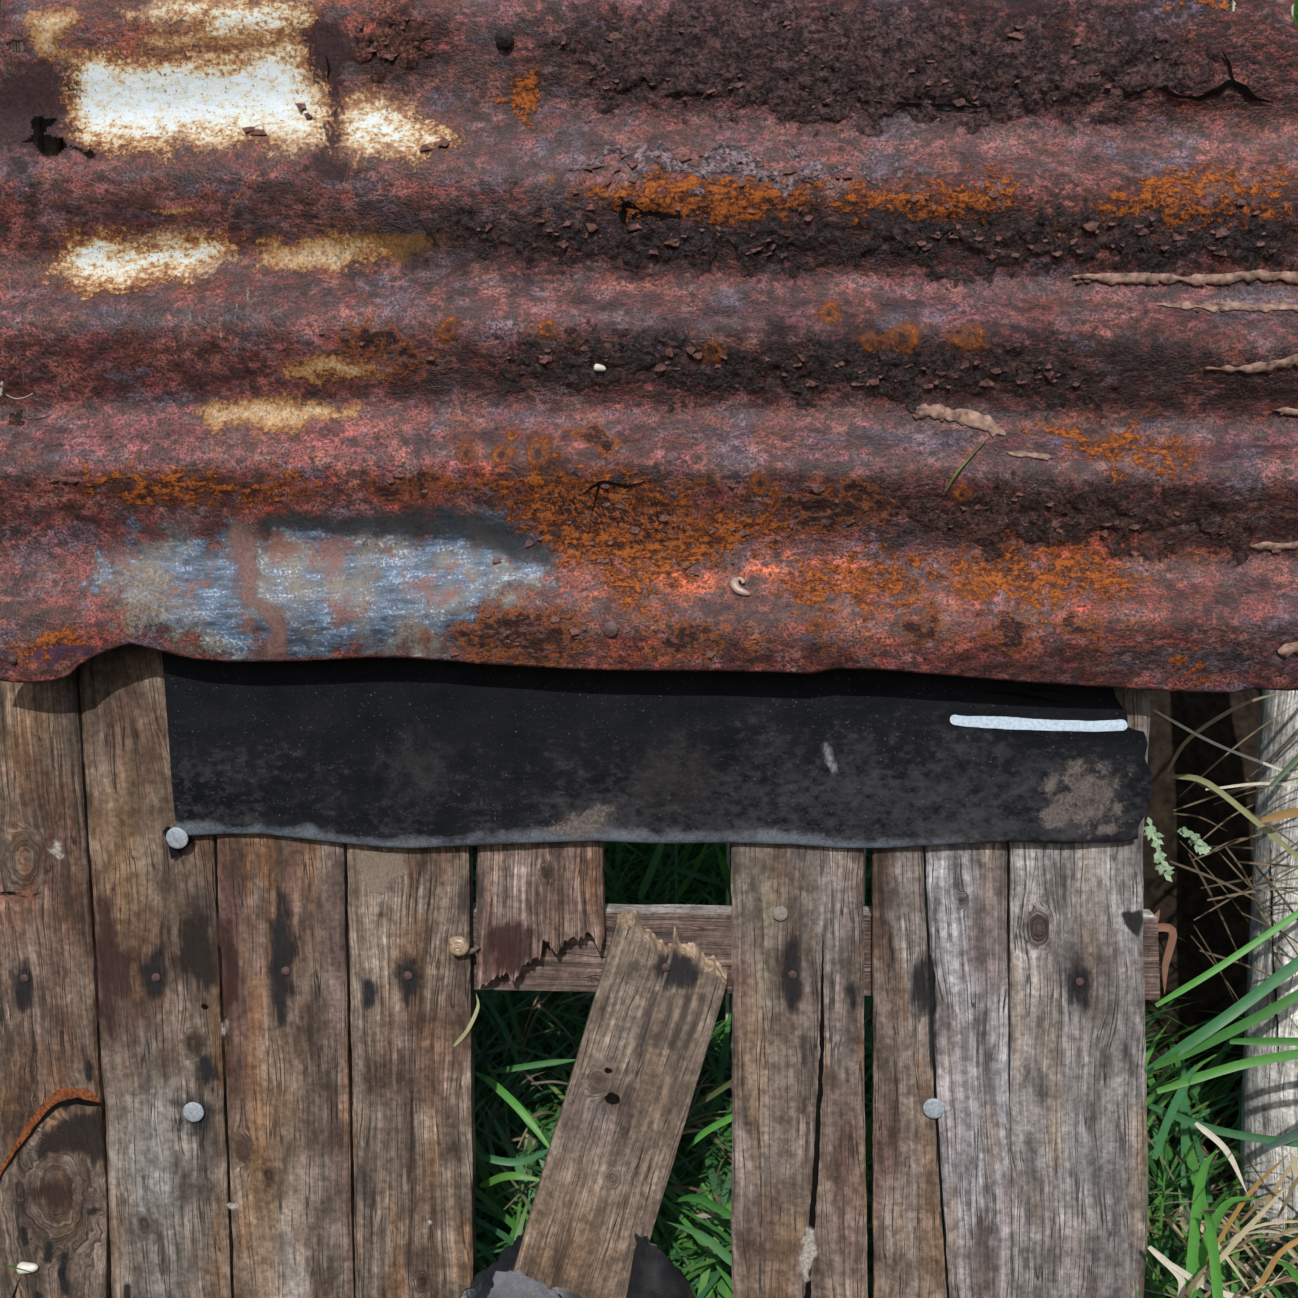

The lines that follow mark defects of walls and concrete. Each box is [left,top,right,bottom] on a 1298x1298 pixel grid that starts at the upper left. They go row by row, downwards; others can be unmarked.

corrosion [336,0,434,94]
crack [1102,52,1273,103]
corrosion [414,0,1298,313]
corrosion [46,456,321,508]
corrosion [6,624,89,667]
corrosion [1157,646,1220,689]
crack [1270,841,1280,1070]
crack [809,935,825,1233]
crack [804,1264,812,1298]